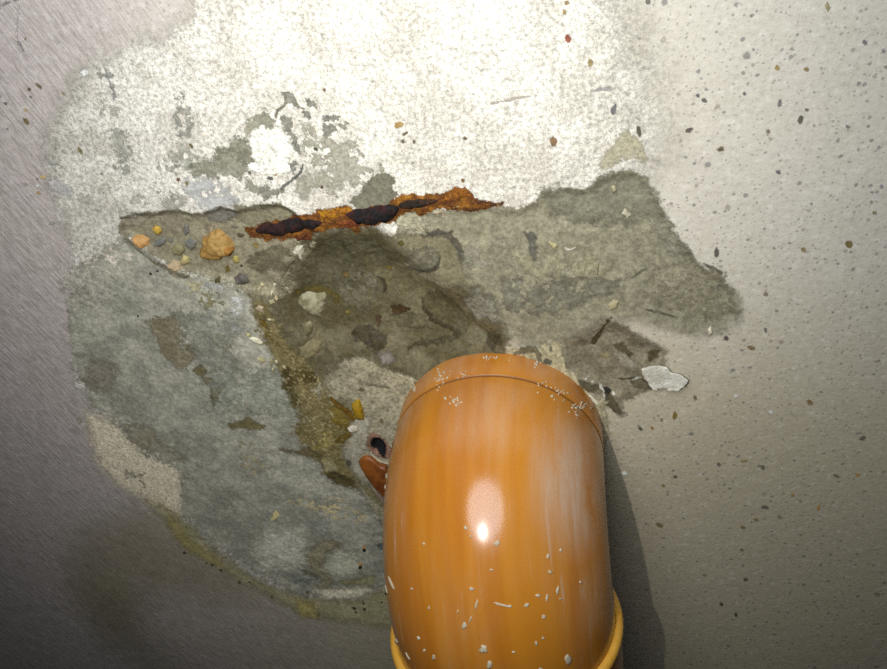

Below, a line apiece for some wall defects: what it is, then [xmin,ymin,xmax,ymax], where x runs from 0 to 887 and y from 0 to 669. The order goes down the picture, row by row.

peeling [97,72,120,117]
peeling [109,129,136,176]
rust [245,186,504,242]
spalling [117,92,740,423]